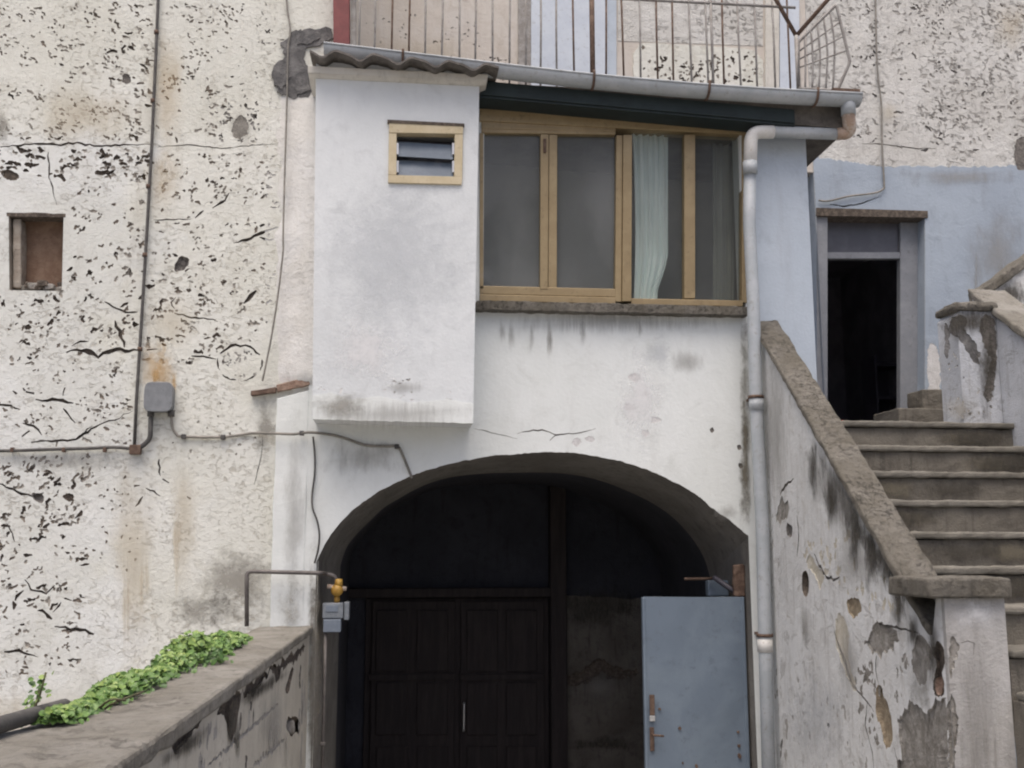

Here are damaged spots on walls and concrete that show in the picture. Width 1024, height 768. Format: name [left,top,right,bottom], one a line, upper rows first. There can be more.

crack [0,142,270,204]
crack [157,193,229,221]
crack [234,229,271,243]
crack [244,290,257,304]
crack [66,301,155,359]
crack [191,343,263,381]
peeling [927,314,998,419]
crack [0,387,132,443]
flaking render [776,496,792,538]
water stain [810,448,894,580]
flaking render [803,519,960,768]
flaking render [172,643,306,768]